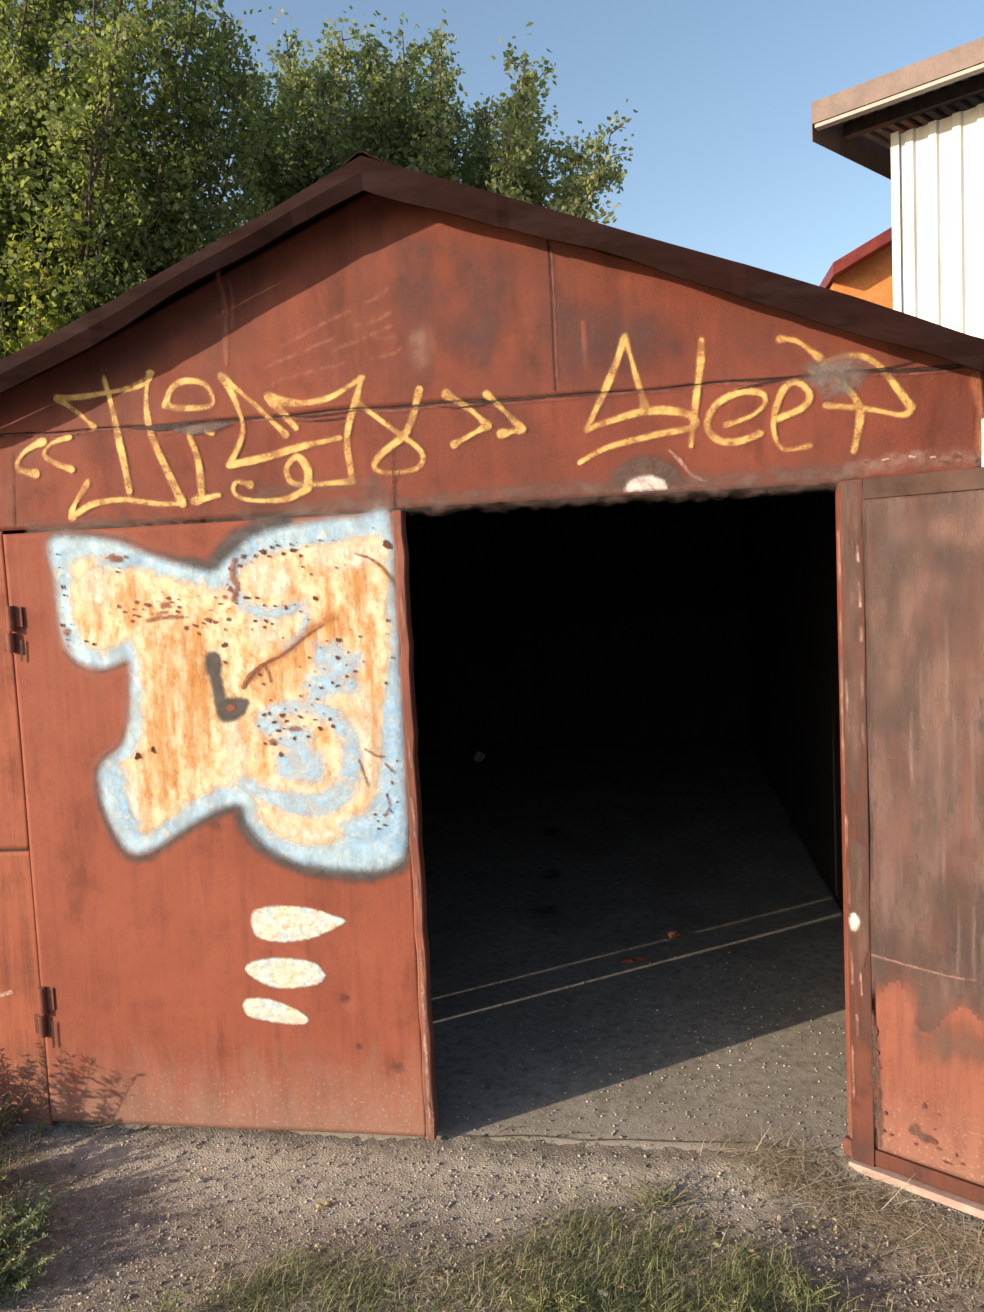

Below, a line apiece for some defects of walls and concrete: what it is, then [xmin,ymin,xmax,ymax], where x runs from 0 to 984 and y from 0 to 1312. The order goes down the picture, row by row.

rust [82,555,378,805]